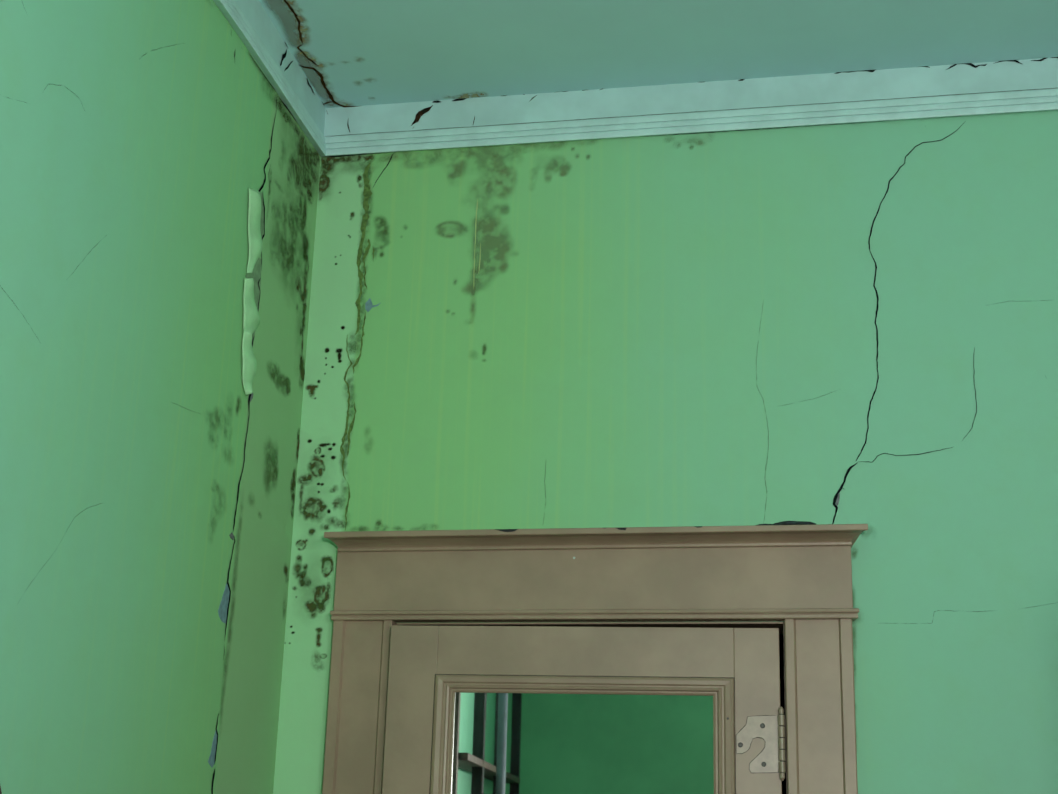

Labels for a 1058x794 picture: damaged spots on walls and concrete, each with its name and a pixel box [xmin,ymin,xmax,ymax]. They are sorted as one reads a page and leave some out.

peeling [242,188,264,402]
crack [258,100,277,309]
damp [270,102,373,399]
damp [438,147,509,310]
crack [832,123,977,524]
crack [223,394,251,660]
mould [266,446,278,486]
mould [284,435,348,658]
crack [211,714,219,794]